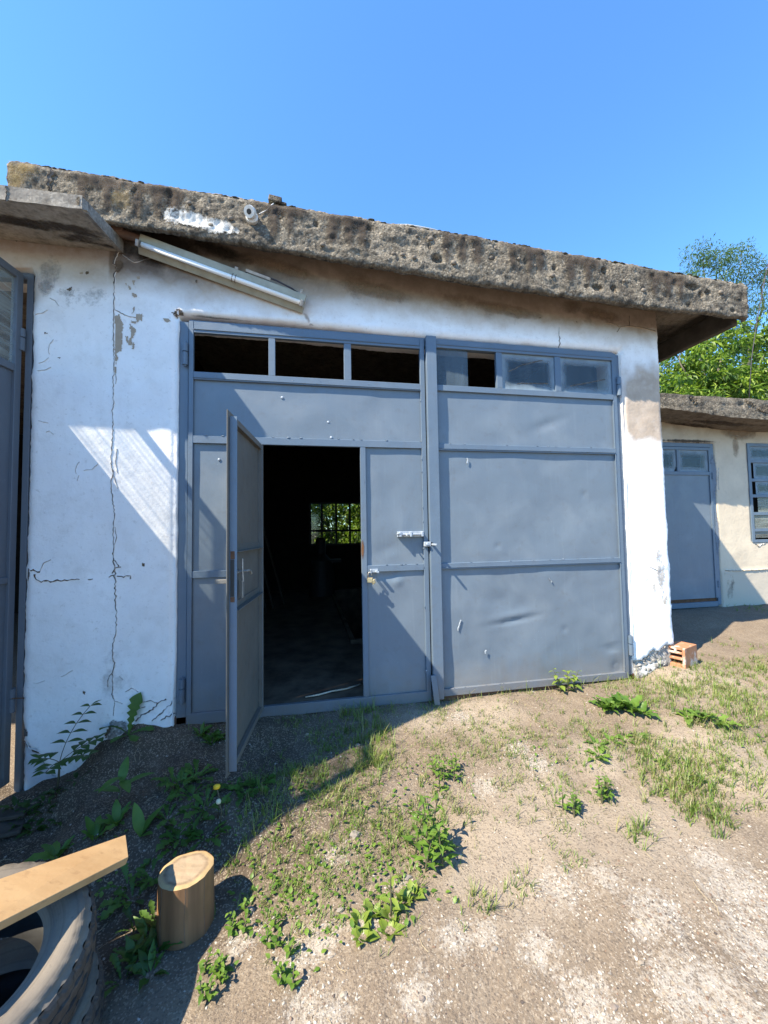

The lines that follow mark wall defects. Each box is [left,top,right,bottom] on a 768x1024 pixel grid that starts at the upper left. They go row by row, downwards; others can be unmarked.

damp [321,214,368,245]
damp [439,230,481,263]
damp [503,243,544,272]
damp [561,255,599,281]
damp [350,282,402,299]
damp [652,271,685,298]
peeling [114,276,142,373]
damp [480,304,529,317]
crack [30,252,175,722]
spalling [633,644,673,679]